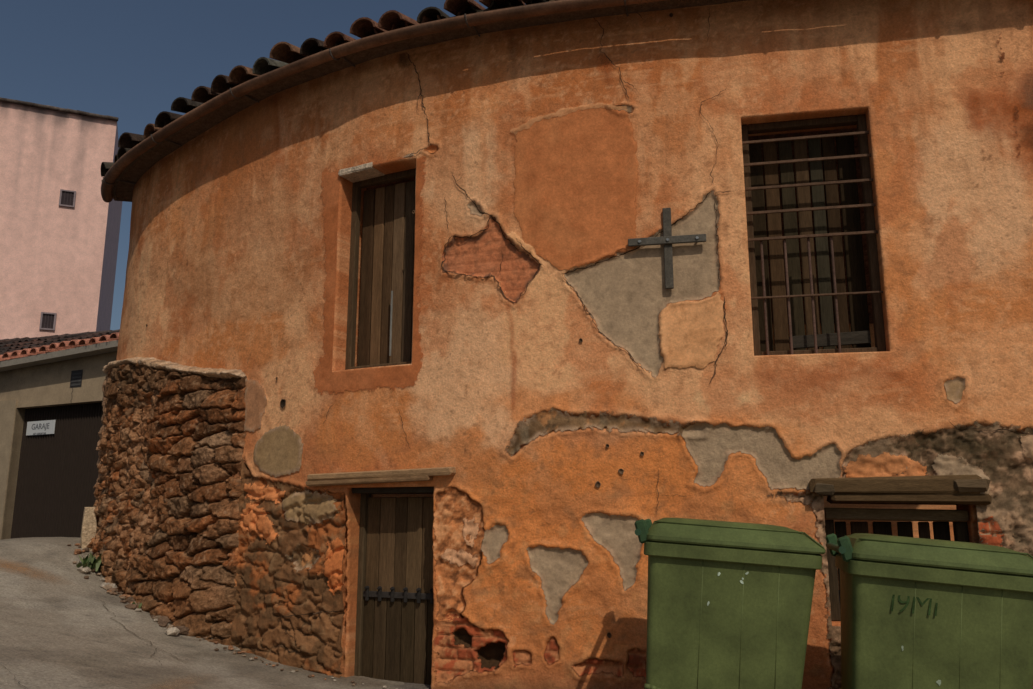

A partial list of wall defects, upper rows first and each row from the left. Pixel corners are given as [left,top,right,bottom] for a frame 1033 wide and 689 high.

crack [408,54,431,156]
spalling [442,201,541,303]
crack [441,89,730,384]
peeling [506,407,697,456]
spalling [841,420,1033,556]
spalling [229,461,346,678]
spalling [432,487,531,685]
spalling [527,545,588,625]
spalling [581,513,642,591]
spalling [767,491,842,689]
spalling [544,638,559,665]
spalling [571,649,647,677]